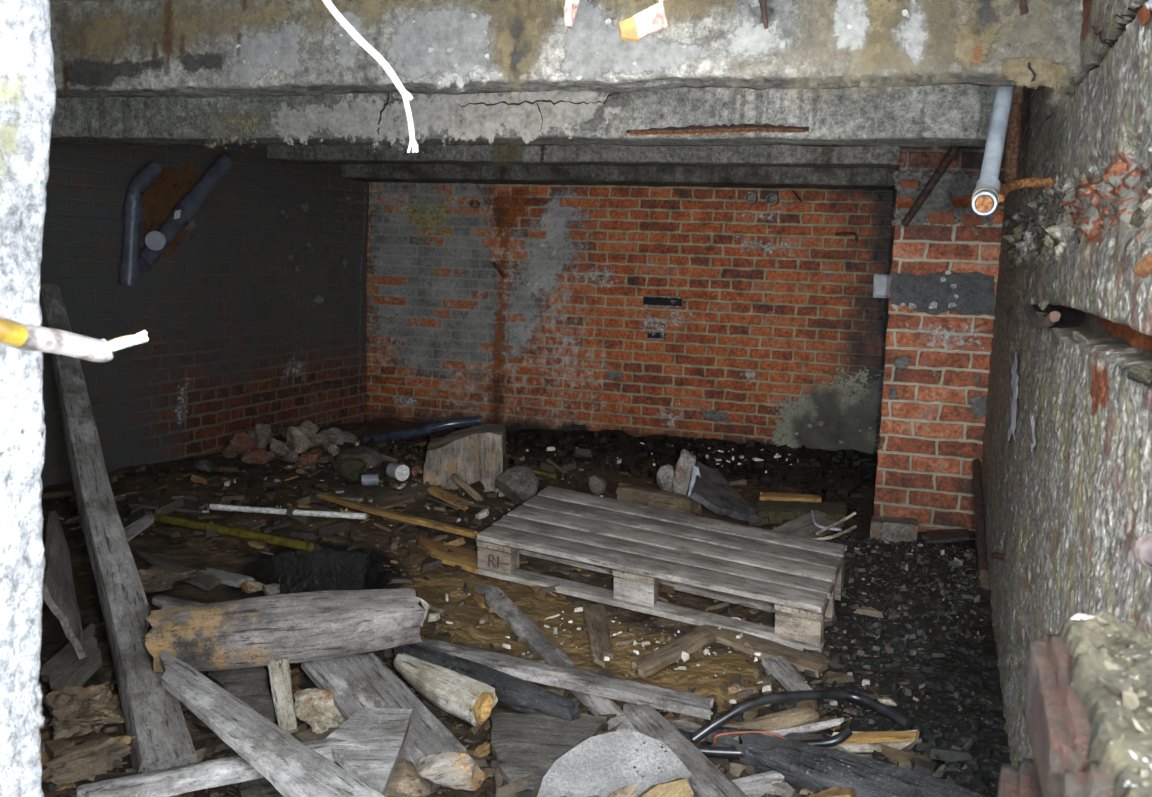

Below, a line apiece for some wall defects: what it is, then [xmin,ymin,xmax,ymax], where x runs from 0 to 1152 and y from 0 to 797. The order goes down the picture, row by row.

water stain [63,0,573,90]
water stain [587,0,730,20]
water stain [787,0,1074,86]
crack [459,92,619,132]
spalling [1018,131,1152,256]
rust [488,189,533,423]
spalling [1032,300,1152,394]
water stain [794,381,883,454]